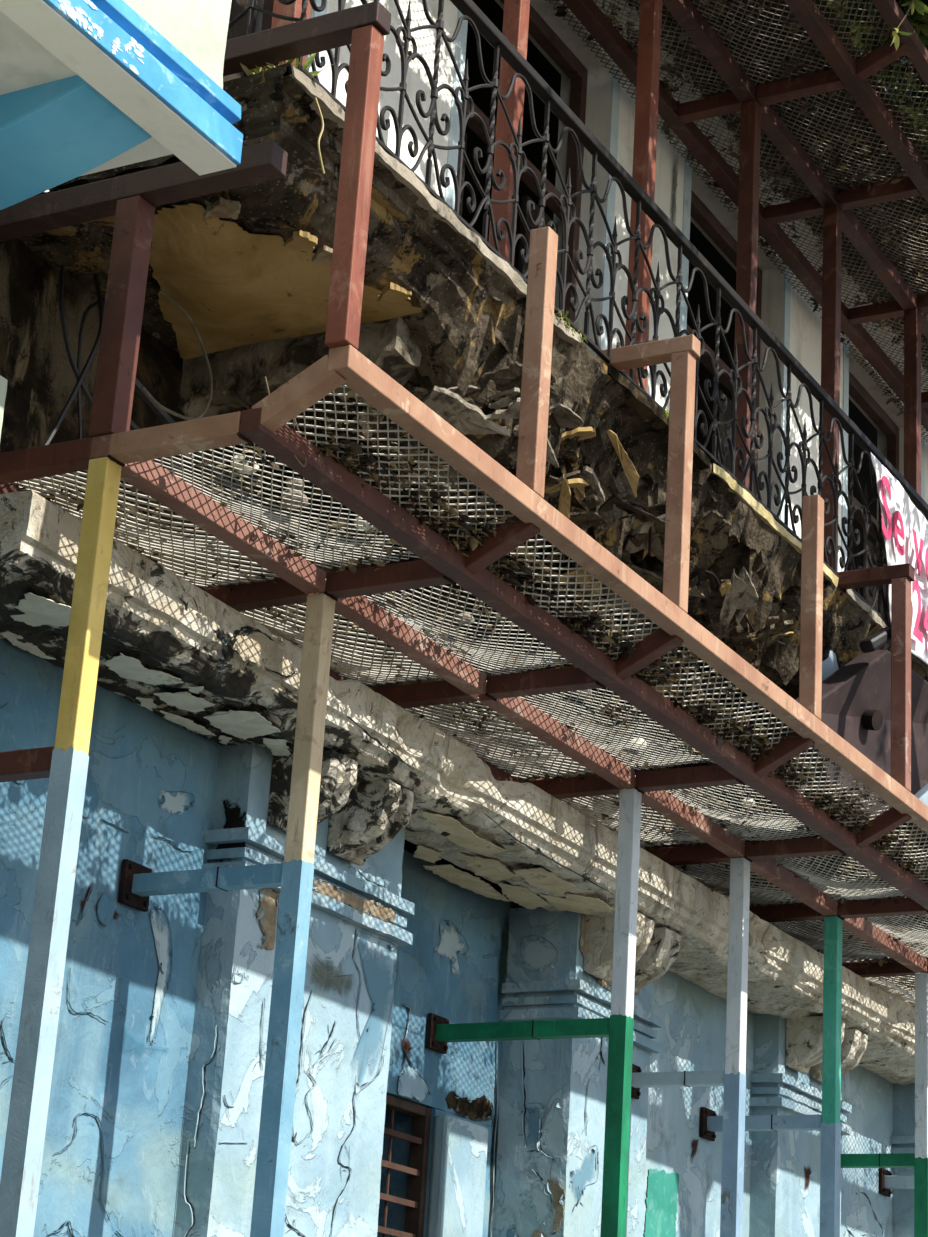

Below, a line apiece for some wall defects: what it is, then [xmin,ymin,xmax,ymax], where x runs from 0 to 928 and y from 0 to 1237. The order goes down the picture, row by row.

peeling [57,0,144,75]
spalling [400,361,522,436]
spalling [544,385,666,594]
peeling [0,592,71,660]
peeling [102,653,291,756]
spalling [233,628,296,679]
crack [0,1018,15,1088]
crack [292,871,393,1145]
crack [54,1103,146,1237]
crack [177,1025,248,1237]
crack [285,1005,433,1237]
crack [49,1220,75,1237]